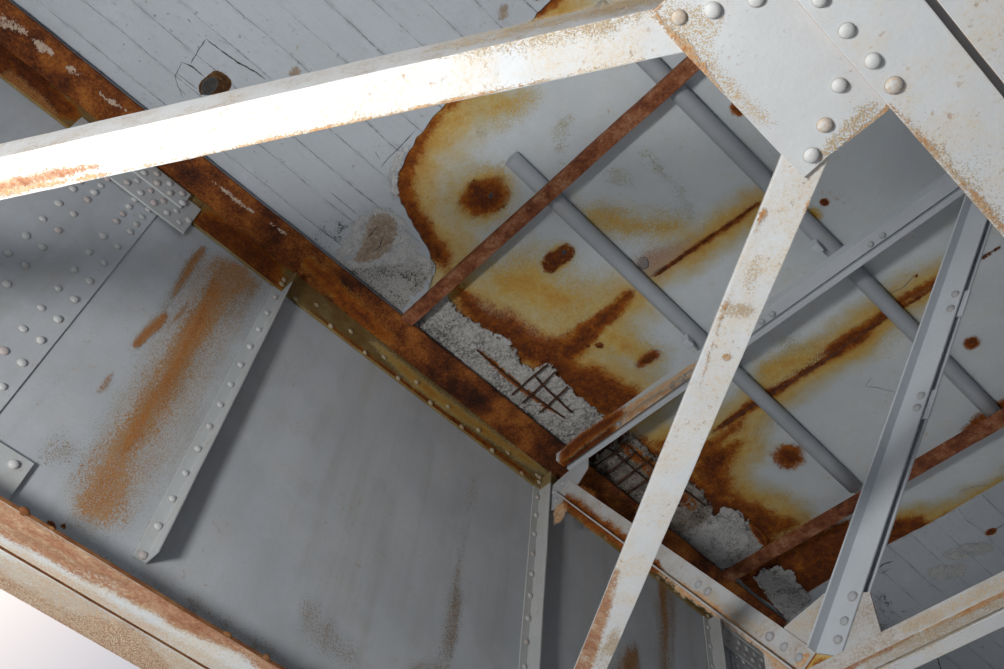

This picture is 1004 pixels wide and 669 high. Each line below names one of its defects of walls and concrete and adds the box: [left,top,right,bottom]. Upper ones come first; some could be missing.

rust [420,0,777,127]
rust [131,206,289,350]
rust [0,57,645,290]
spalling [314,144,435,310]
spalling [416,295,605,444]
rust [447,250,762,467]
rust [0,501,288,669]
spalling [590,431,659,504]
spalling [668,483,768,569]
rust [688,382,823,549]
spalling [753,566,812,621]
rust [739,520,851,637]